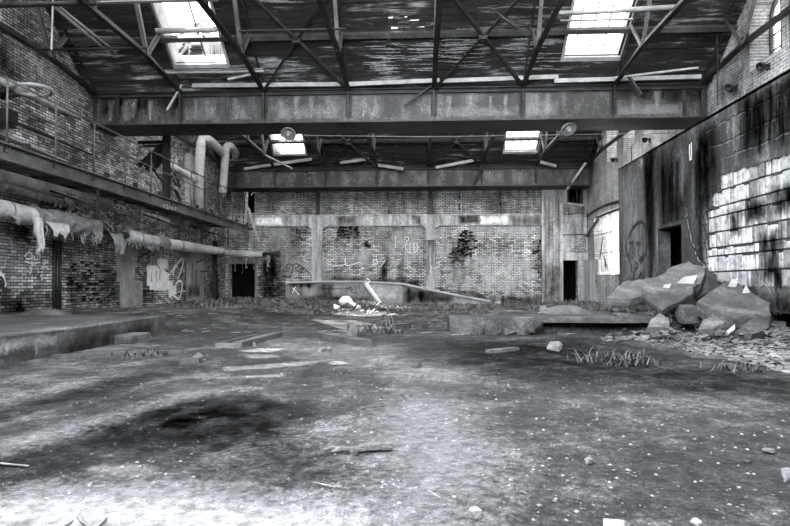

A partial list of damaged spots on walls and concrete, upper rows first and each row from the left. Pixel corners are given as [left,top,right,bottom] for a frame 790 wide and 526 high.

leakage [738,78,790,151]
spalling [337,226,371,248]
spalling [448,230,478,265]
spalling [703,152,790,290]
spalling [67,260,115,303]